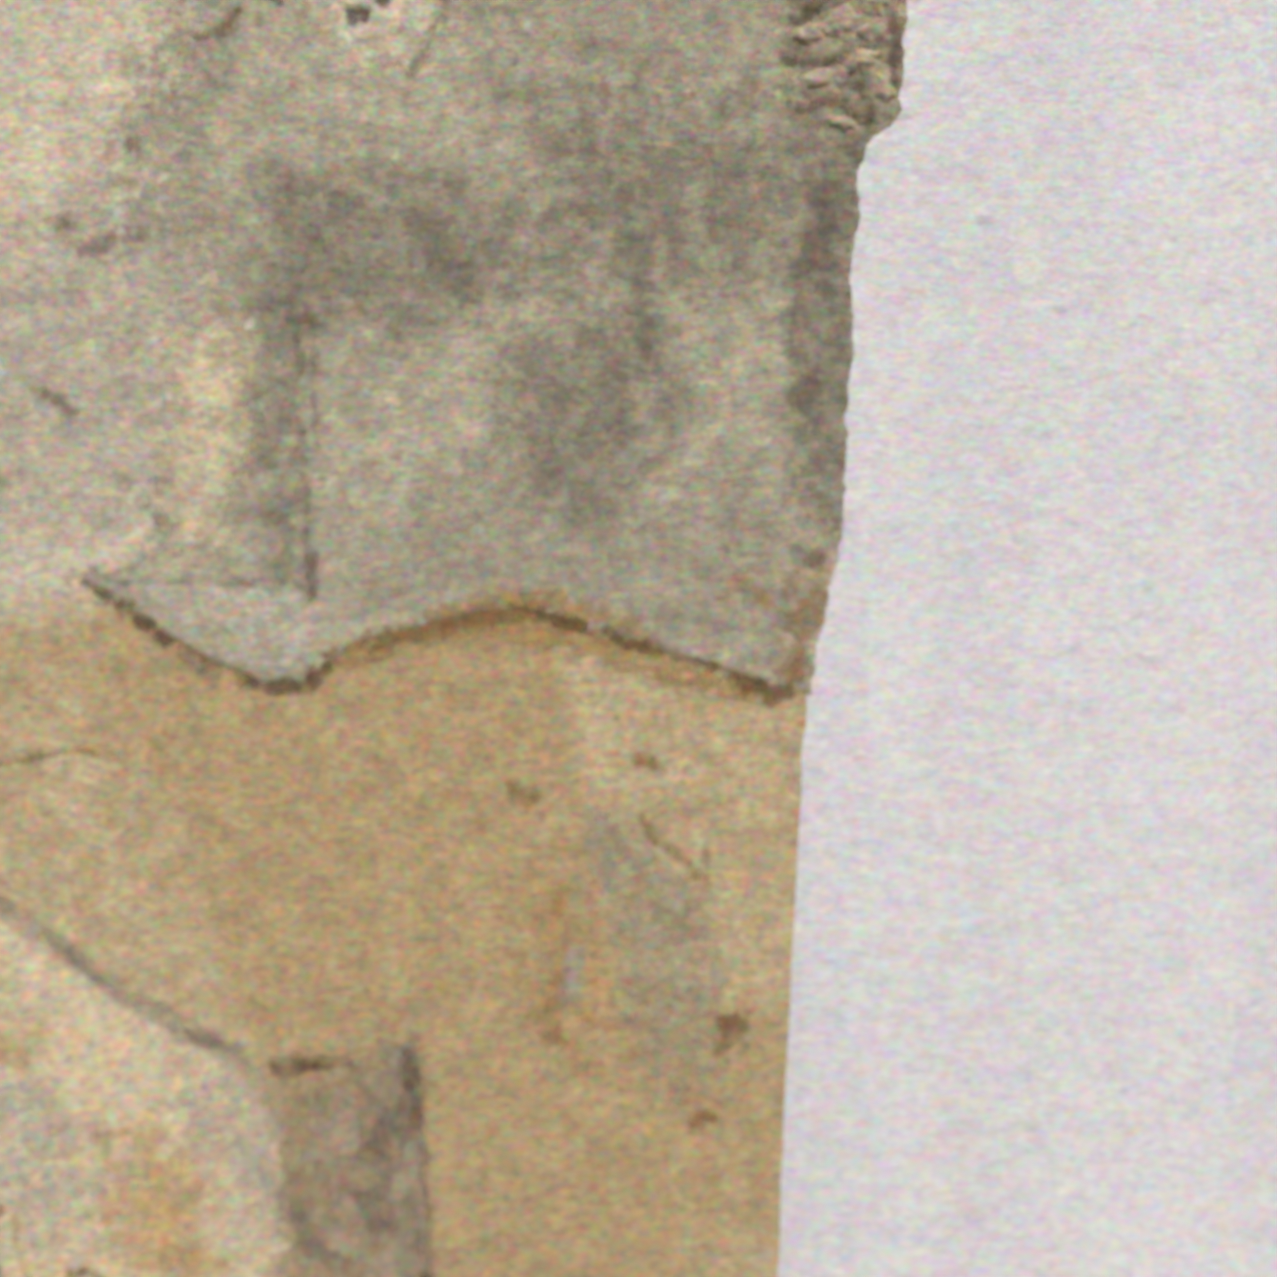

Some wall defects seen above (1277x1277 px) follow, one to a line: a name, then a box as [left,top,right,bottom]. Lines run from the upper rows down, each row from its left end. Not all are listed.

damp [271,183,495,321]
peeling [83,0,907,694]
damp [515,121,863,526]
peeling [715,1012,748,1052]